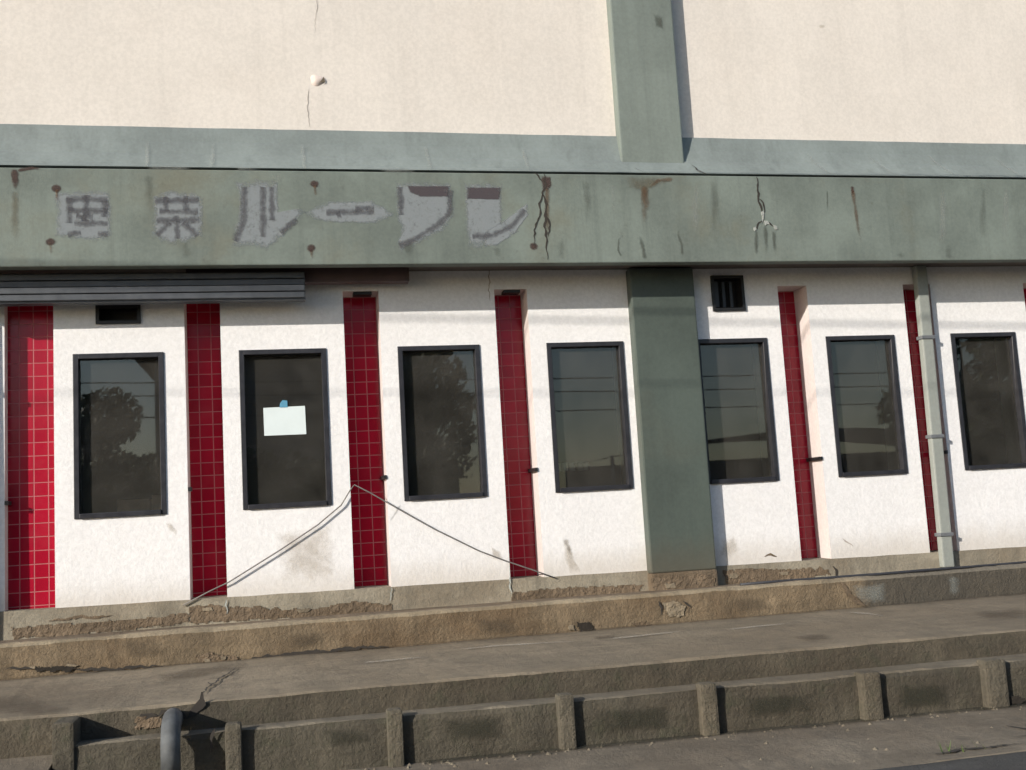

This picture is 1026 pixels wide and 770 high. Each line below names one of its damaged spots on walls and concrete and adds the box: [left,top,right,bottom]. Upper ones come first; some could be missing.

crack [530,173,551,260]
crack [754,177,778,231]
spalling [11,601,392,640]